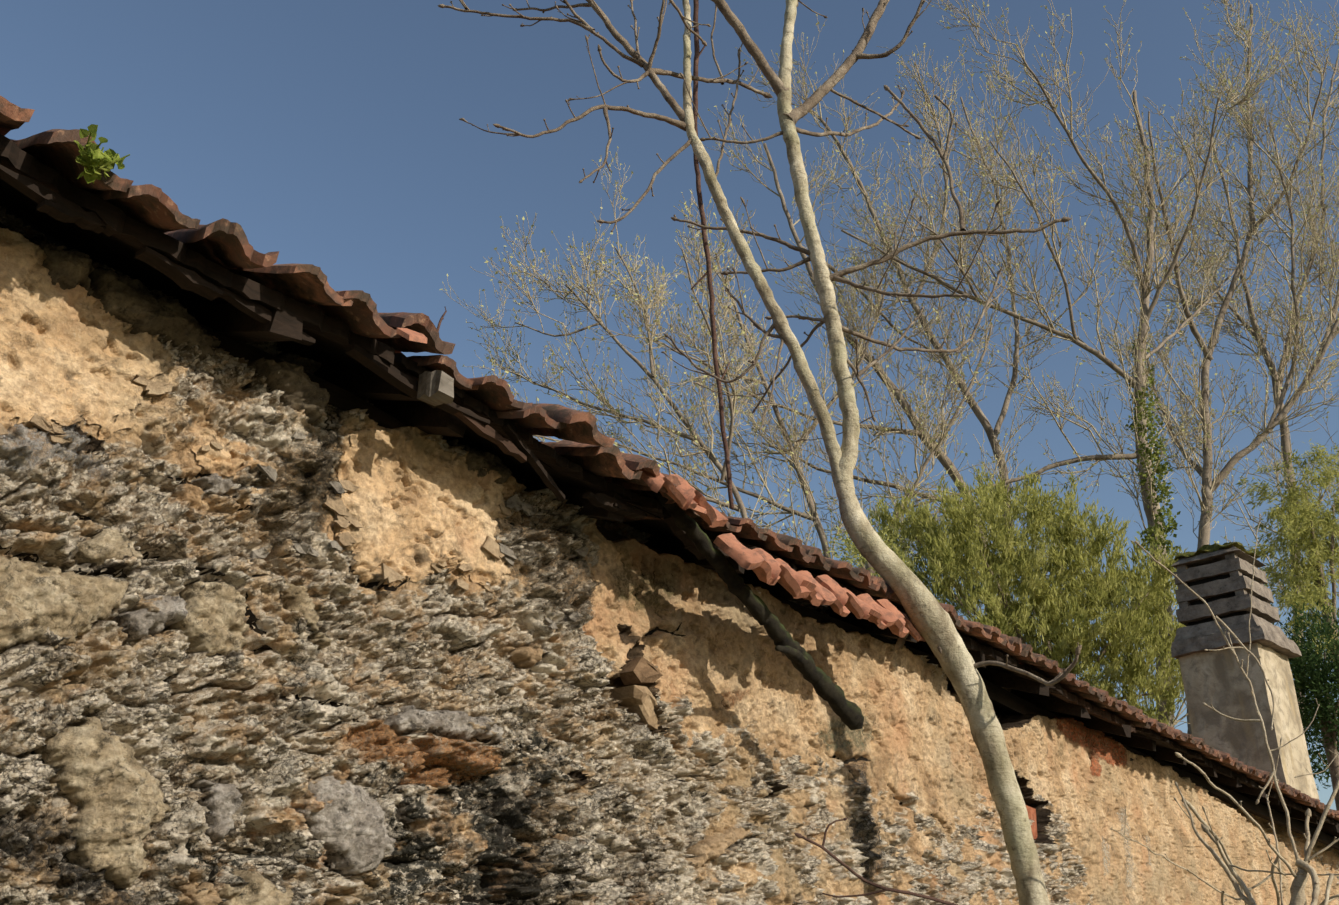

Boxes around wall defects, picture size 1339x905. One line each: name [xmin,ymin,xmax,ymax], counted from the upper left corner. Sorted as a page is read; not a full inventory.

flaking render [186,426,601,629]
crack [641,623,686,638]
spalling [603,624,671,739]
spalling [567,770,593,787]
water stain [819,718,872,796]
spalling [1015,770,1057,844]
water stain [847,815,889,879]